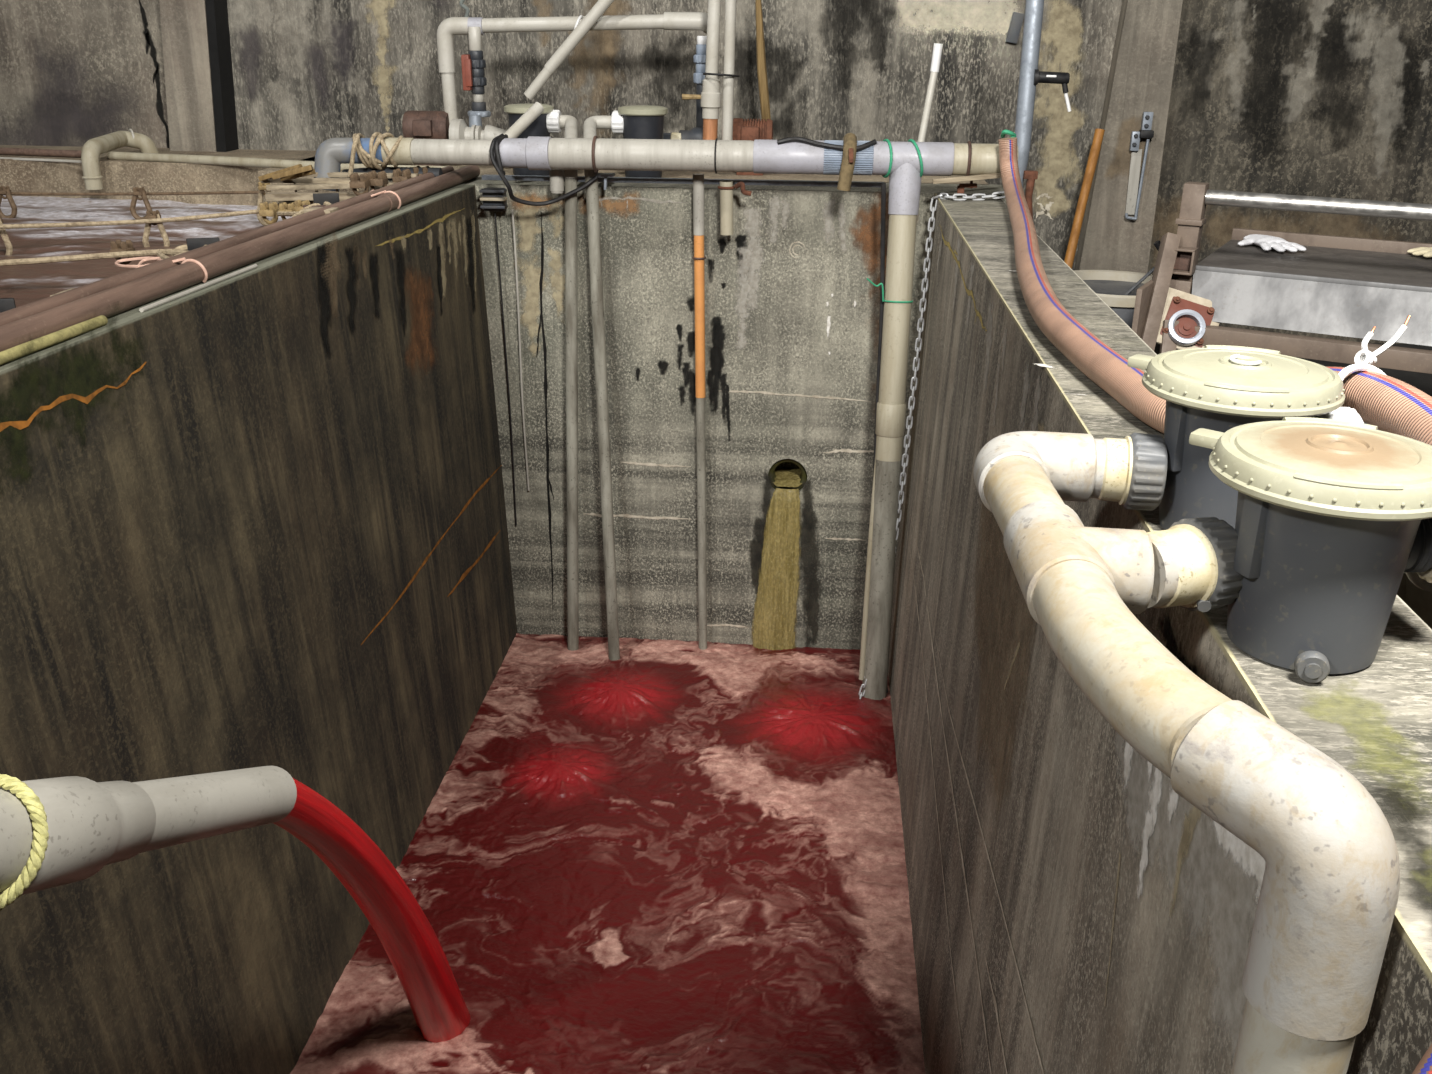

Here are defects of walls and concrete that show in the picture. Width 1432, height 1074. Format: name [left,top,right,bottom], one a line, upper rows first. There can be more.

crack [138,0,169,148]
water stain [1187,34,1221,111]
water stain [1235,0,1356,154]
water stain [1377,39,1420,151]
water stain [658,197,871,441]
crack [0,362,147,432]